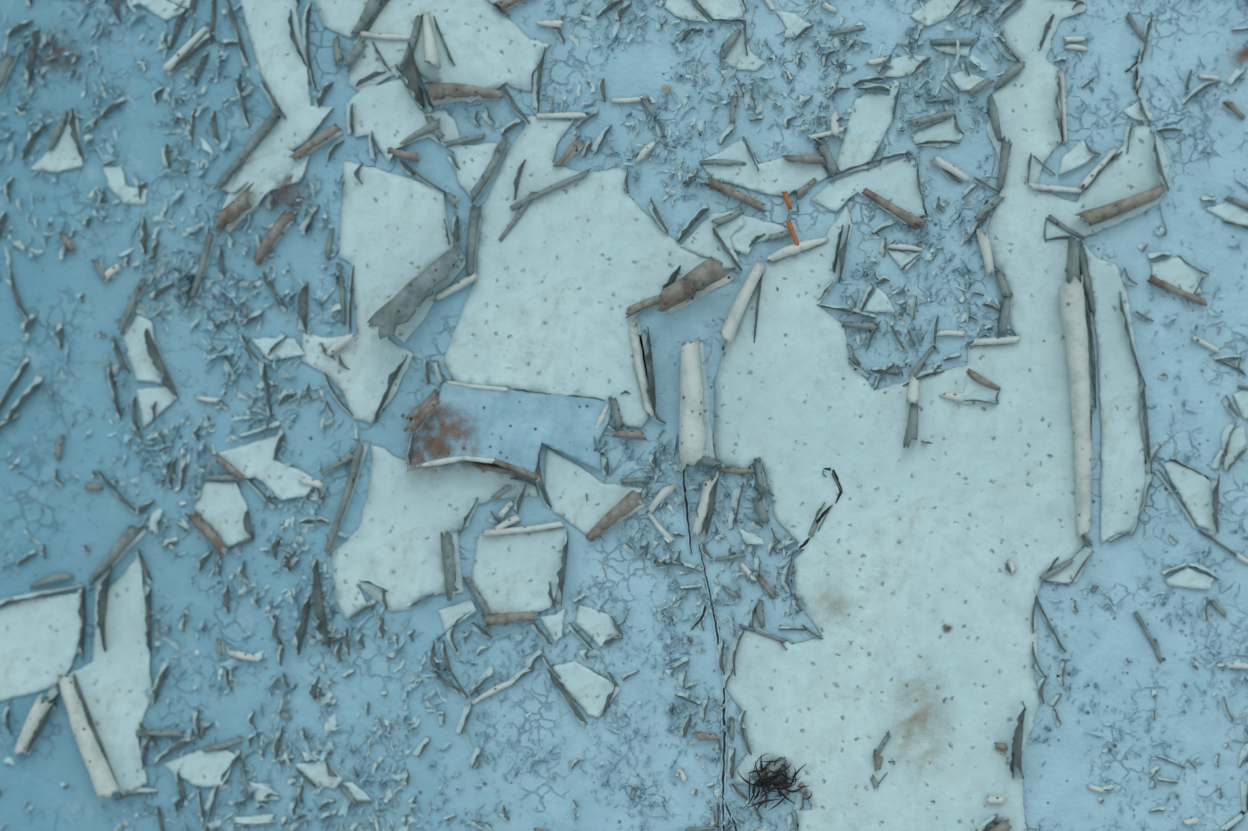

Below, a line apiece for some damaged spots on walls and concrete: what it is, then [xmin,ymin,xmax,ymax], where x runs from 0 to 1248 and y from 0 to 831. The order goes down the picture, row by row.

peeling [0,176,84,341]
peeling [1138,244,1224,306]
peeling [1199,176,1248,293]
peeling [1191,313,1248,379]
peeling [0,353,54,431]
peeling [34,435,80,487]
rust [412,408,471,468]
peeling [194,638,267,702]
peeling [1133,611,1169,679]
peeling [1162,594,1248,831]
peeling [1083,707,1208,831]
peeling [459,788,510,831]